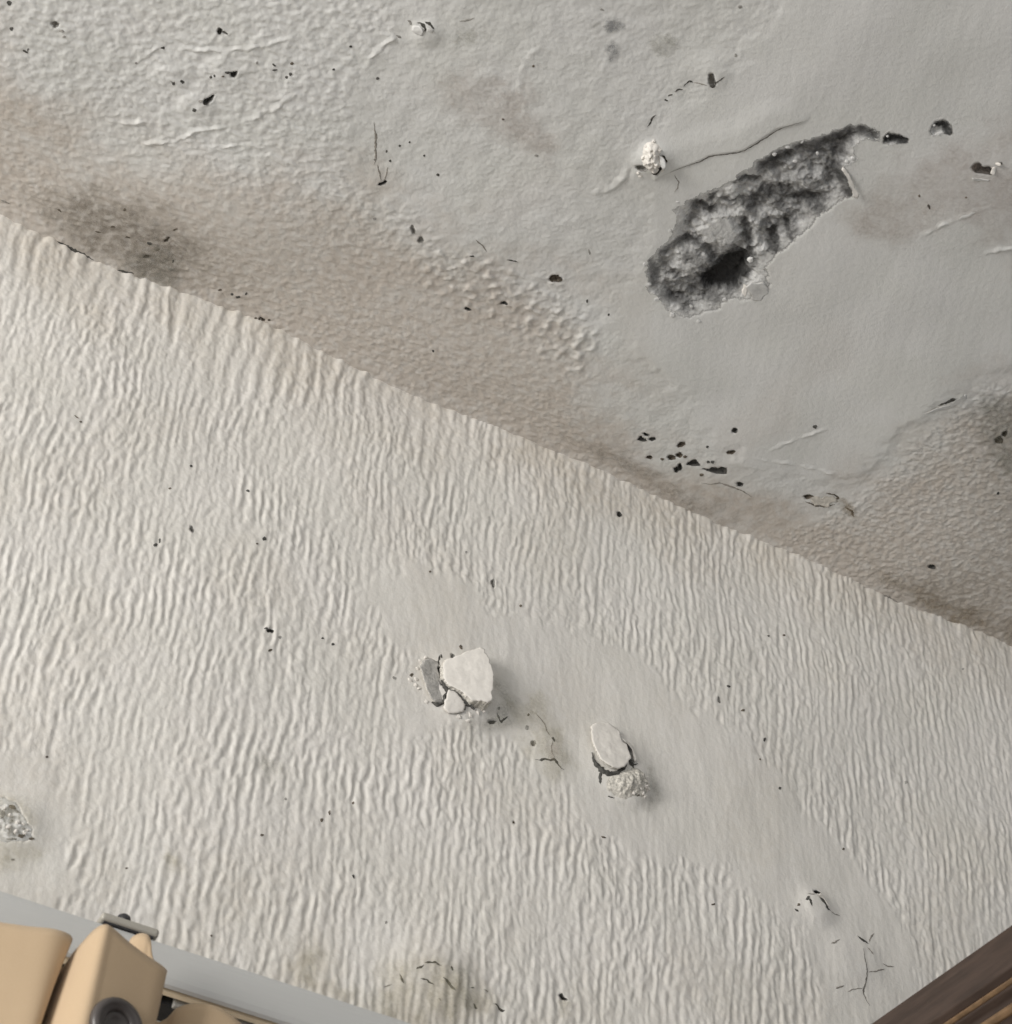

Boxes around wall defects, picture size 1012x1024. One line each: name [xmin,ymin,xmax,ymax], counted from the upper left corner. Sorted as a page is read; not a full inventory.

spalling [930,120,952,136]
spalling [636,123,908,323]
spalling [647,442,727,476]
crack [525,713,562,769]
crack [795,890,894,1004]